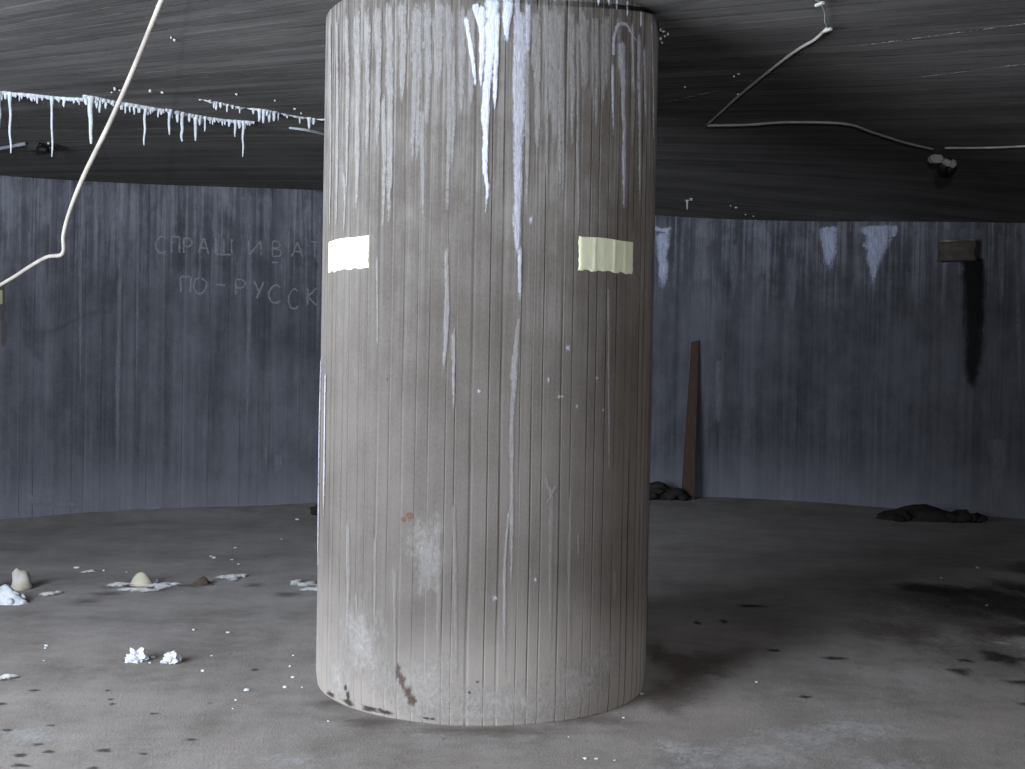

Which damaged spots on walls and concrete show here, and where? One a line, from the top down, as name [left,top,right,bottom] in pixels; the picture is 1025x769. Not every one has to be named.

leakage [274,0,670,299]
efflorescence [820,226,837,269]
efflorescence [861,225,898,281]
efflorescence [443,249,455,405]
leakage [963,259,984,386]